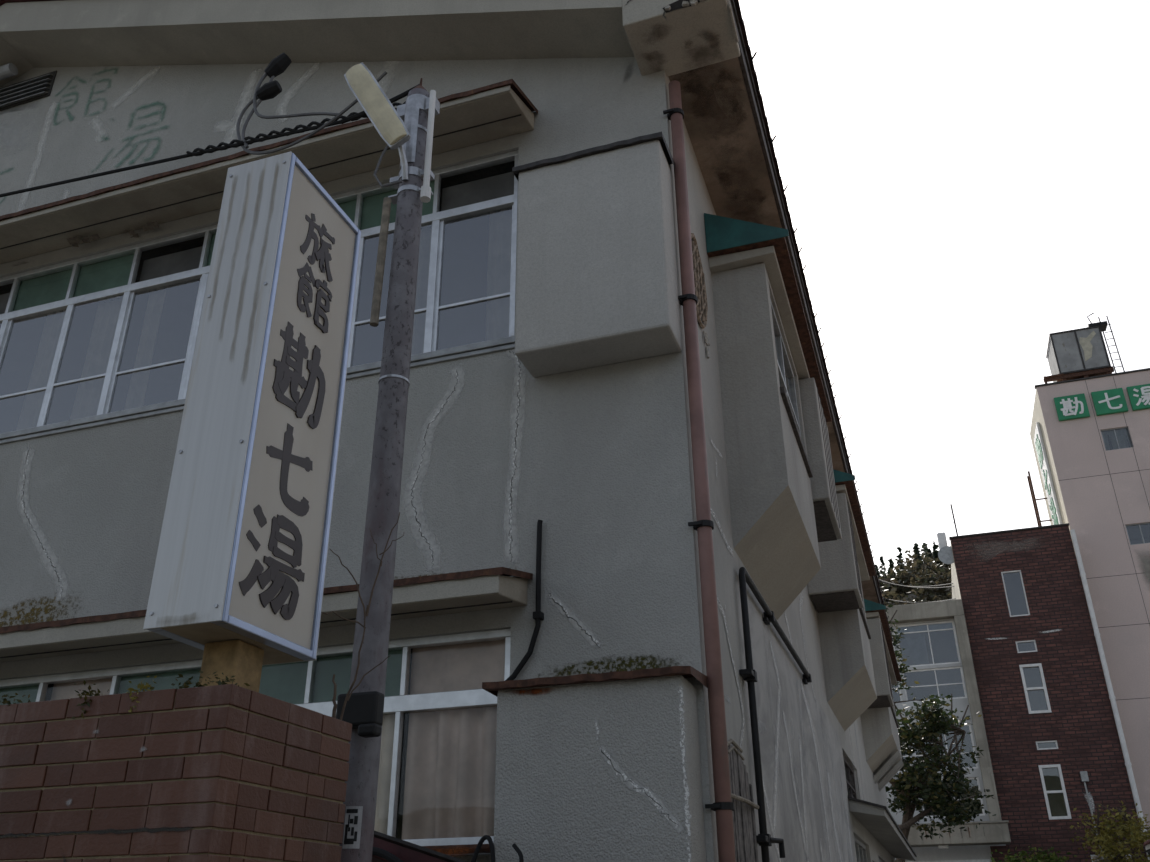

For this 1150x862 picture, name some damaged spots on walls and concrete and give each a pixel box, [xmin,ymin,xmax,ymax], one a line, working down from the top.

crack [17,447,67,600]
crack [404,368,465,570]
crack [504,349,525,563]
crack [595,721,682,833]
crack [717,597,745,749]
crack [762,594,853,862]